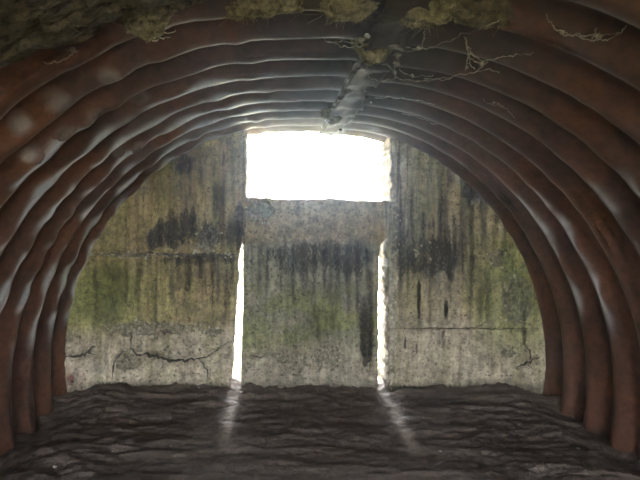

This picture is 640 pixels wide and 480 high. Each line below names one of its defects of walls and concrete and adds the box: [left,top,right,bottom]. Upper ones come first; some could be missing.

crack [65,346,96,358]
crack [112,327,229,379]
water stain [146,207,242,311]
water stain [267,240,373,362]
water stain [396,191,464,318]